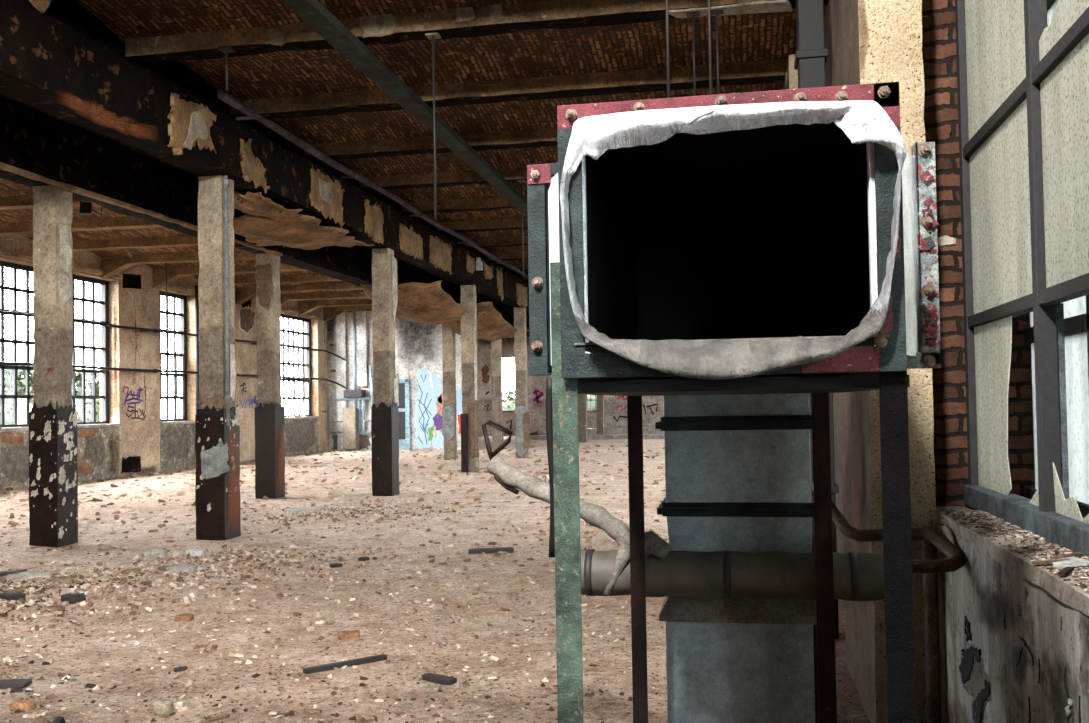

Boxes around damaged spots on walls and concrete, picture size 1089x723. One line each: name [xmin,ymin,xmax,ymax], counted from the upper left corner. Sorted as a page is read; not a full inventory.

flaking render [167,93,217,155]
flaking render [240,138,270,194]
flaking render [309,165,345,228]
flaking render [364,199,384,244]
spalling [239,263,275,335]
flaking render [391,223,453,328]
flaking render [465,252,528,308]
peeling [149,342,240,496]
peeling [0,411,107,539]
peeling [959,616,992,723]
crack [1000,602,1081,723]